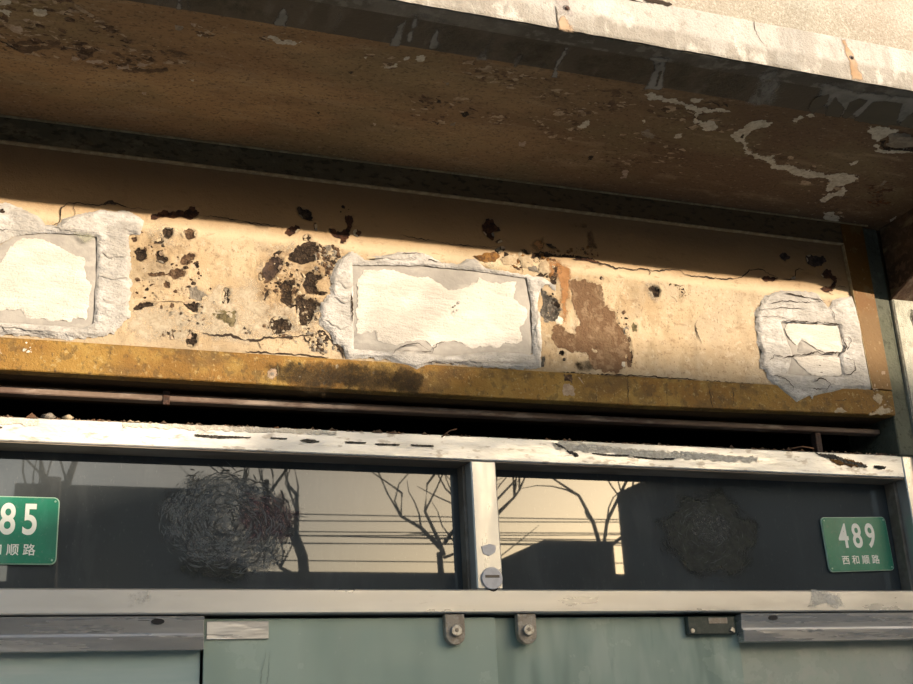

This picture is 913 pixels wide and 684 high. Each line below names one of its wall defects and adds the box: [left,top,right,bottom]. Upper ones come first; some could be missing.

crack [632,0,672,8]
peeling [0,0,191,74]
spalling [867,126,913,154]
peeling [644,92,893,221]
rust [151,206,199,220]
peeling [538,276,637,374]
crack [399,235,856,391]
water stain [270,362,424,393]
peeling [562,374,584,396]